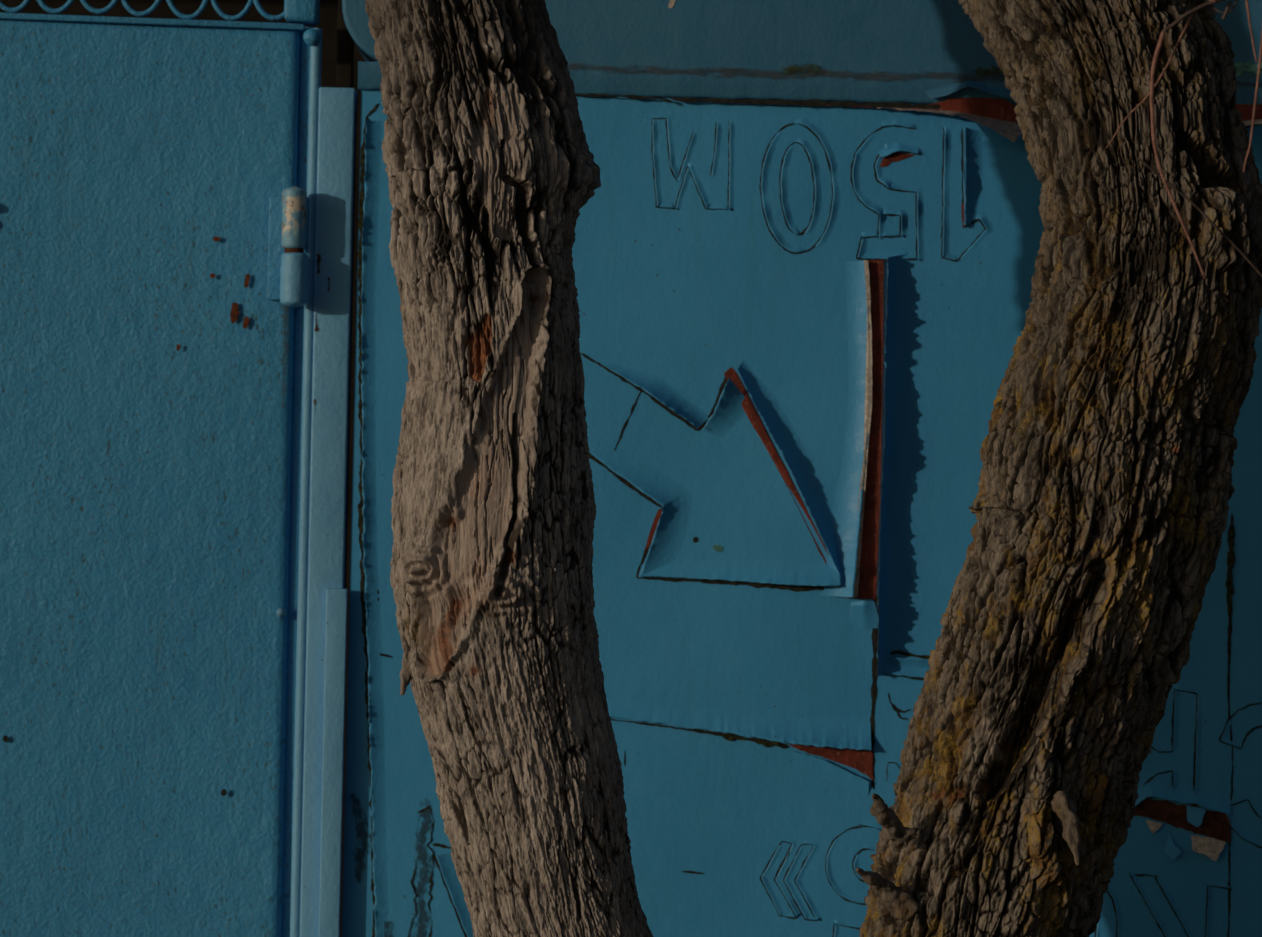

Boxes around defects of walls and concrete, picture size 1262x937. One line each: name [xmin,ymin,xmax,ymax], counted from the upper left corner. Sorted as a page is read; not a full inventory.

rust [230,302,250,329]
peeling [1133,780,1231,861]